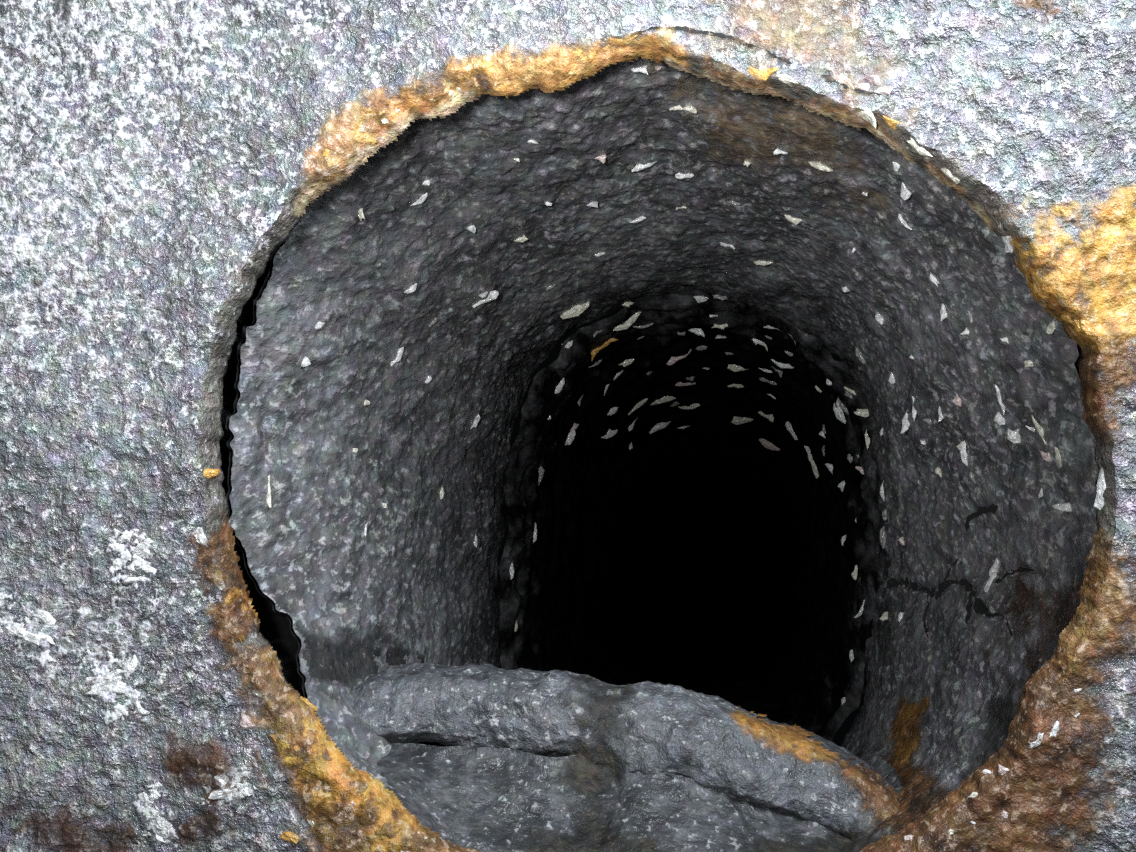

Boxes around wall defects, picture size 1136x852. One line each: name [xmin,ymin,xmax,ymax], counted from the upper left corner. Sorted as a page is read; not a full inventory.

crack [635,26,792,64]
crack [821,74,893,95]
rust [1010,185,1136,442]
rust [203,469,220,479]
crack [965,504,998,530]
crack [869,551,1036,637]
rust [190,523,480,852]
rust [732,530,1136,852]
rust [165,739,234,848]